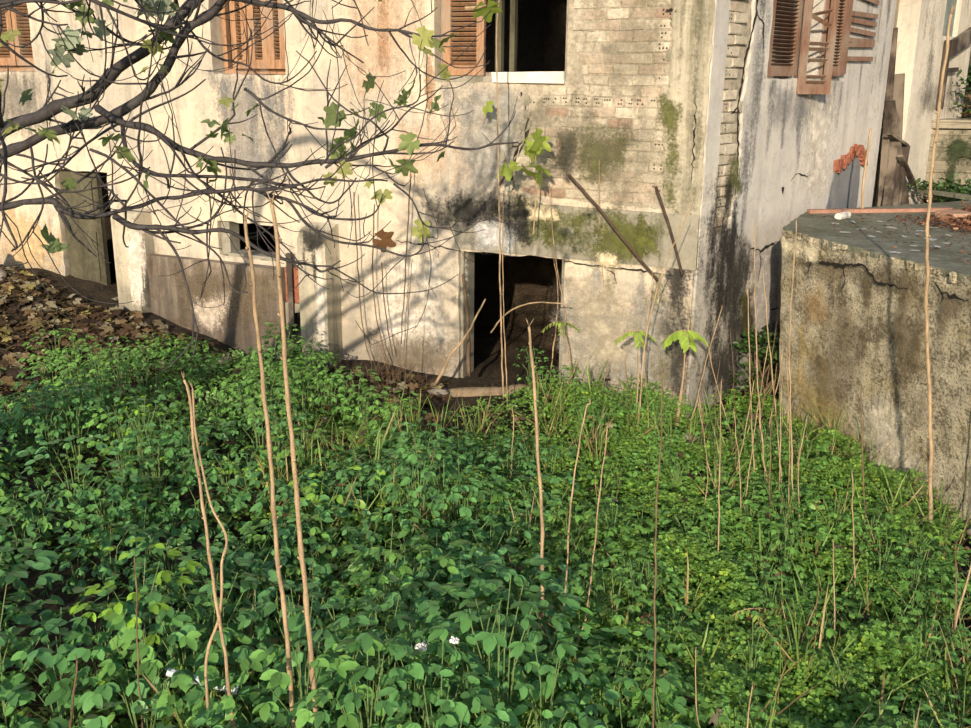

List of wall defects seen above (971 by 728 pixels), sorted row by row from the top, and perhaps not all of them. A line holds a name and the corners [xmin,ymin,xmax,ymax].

crack [731,0,764,199]
leakage [553,130,576,183]
spalling [825,144,868,209]
leakage [421,191,549,251]
leakage [695,139,755,402]
crack [750,241,907,289]
crack [935,283,969,304]